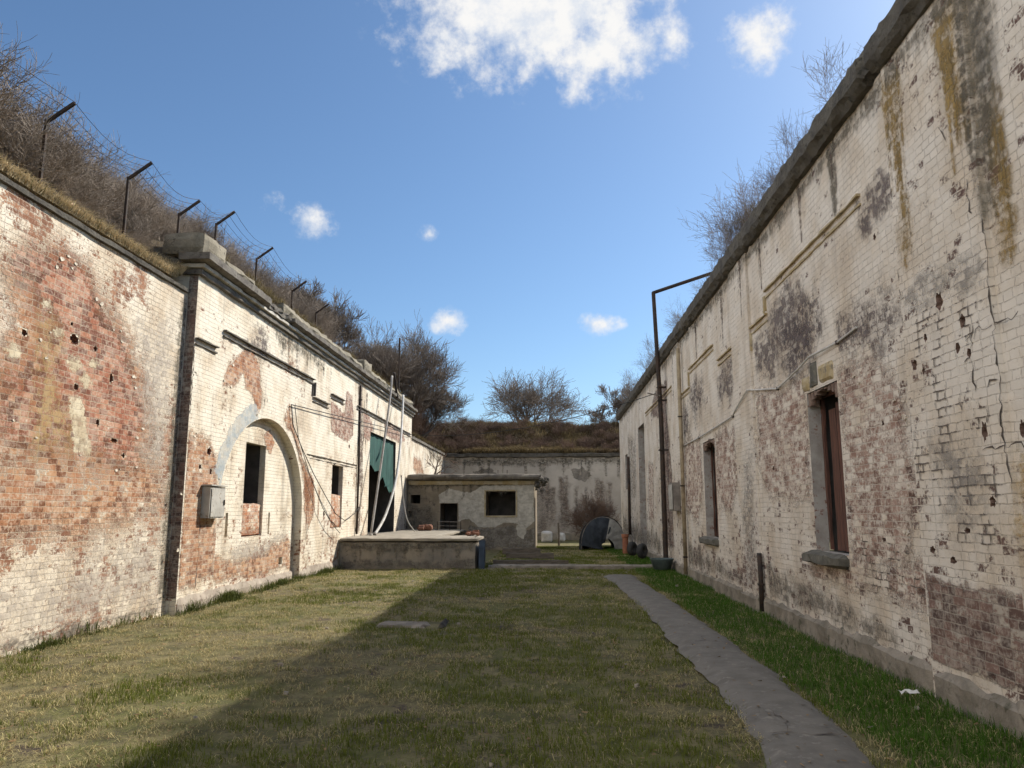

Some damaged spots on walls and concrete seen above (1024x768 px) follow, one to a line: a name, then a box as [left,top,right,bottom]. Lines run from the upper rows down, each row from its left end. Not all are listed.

peeling [0,230,291,598]
peeling [715,425,738,516]
peeling [753,374,813,509]
water stain [662,0,1002,381]
peeling [808,343,1024,690]
crack [964,184,1024,484]